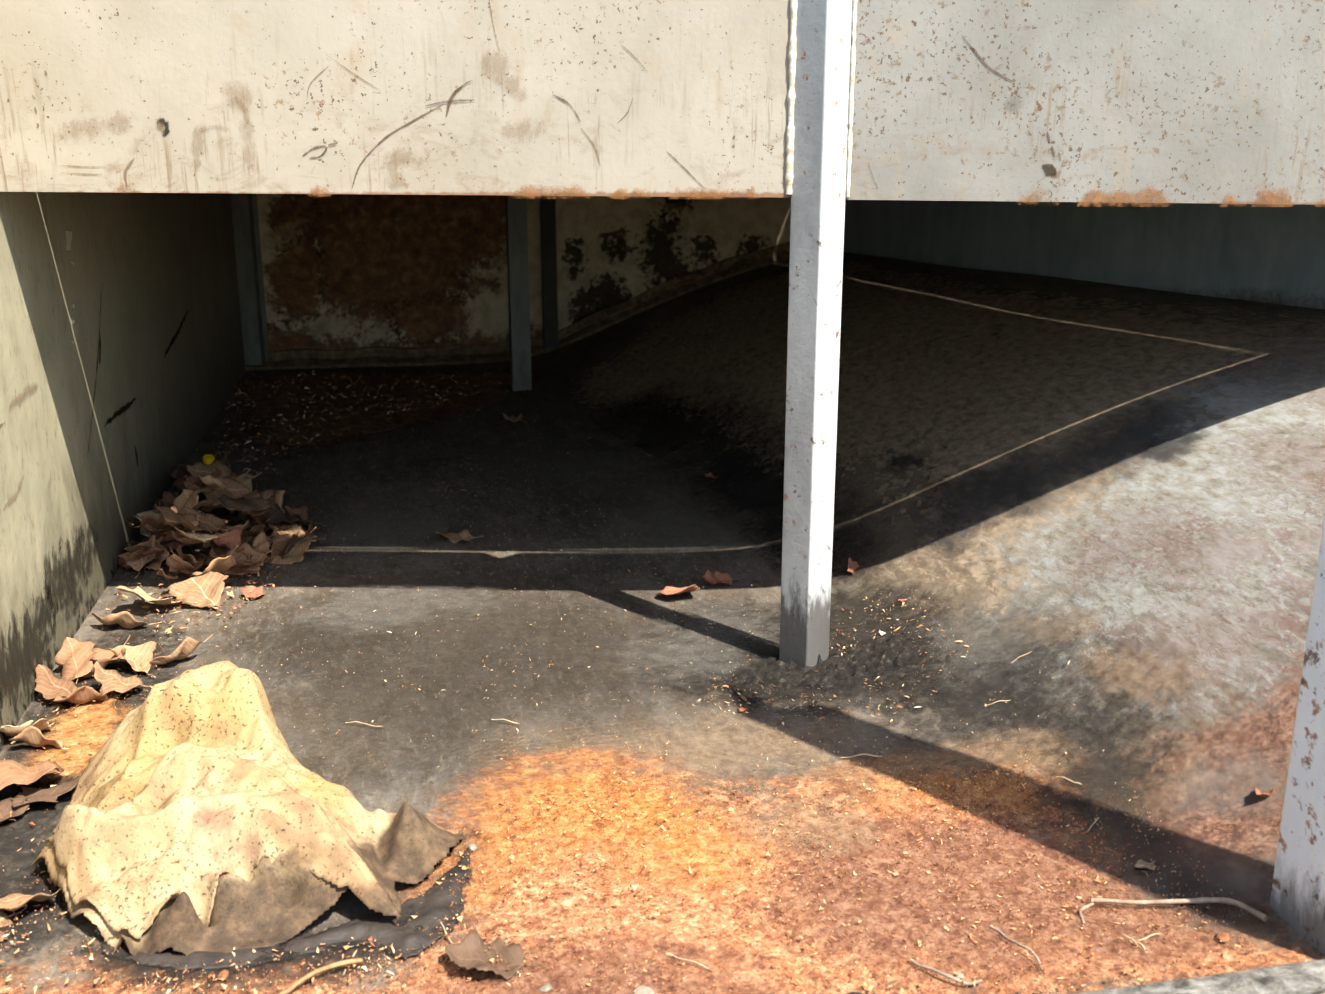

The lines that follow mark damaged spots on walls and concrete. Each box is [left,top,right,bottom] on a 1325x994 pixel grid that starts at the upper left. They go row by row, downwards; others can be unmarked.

corrosion [610,189,644,199]
corrosion [672,190,754,199]
corrosion [1078,187,1164,206]
corrosion [1224,191,1291,207]
water stain [0,523,118,750]